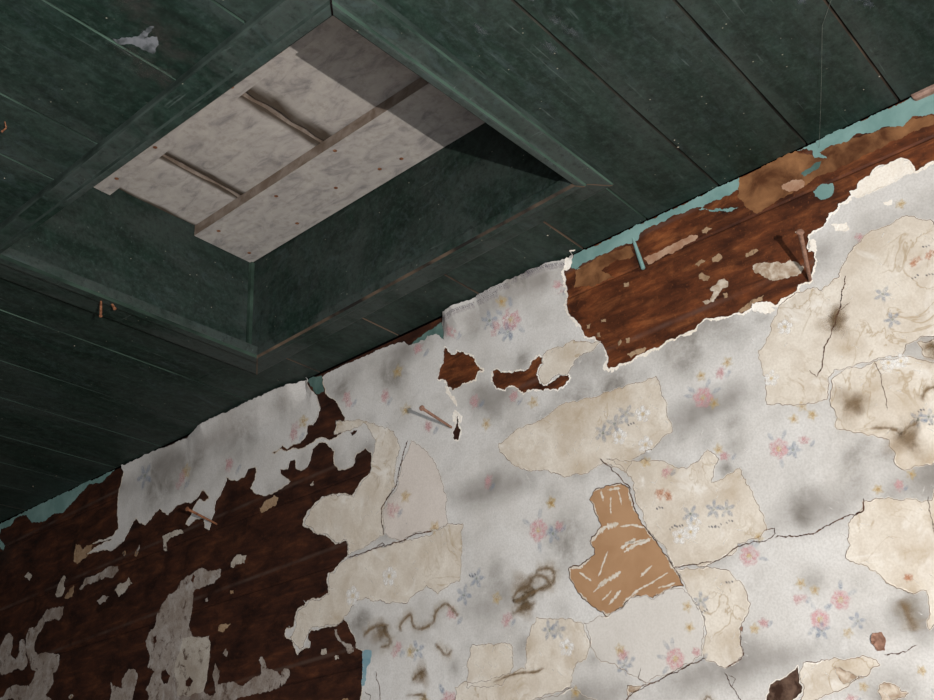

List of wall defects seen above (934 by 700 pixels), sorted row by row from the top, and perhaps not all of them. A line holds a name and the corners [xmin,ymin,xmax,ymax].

peeling [561,94,934,373]
peeling [412,323,571,442]
peeling [0,375,372,700]
crack [348,441,431,558]
crack [674,498,865,568]
crack [626,658,705,700]
crack [726,636,744,700]